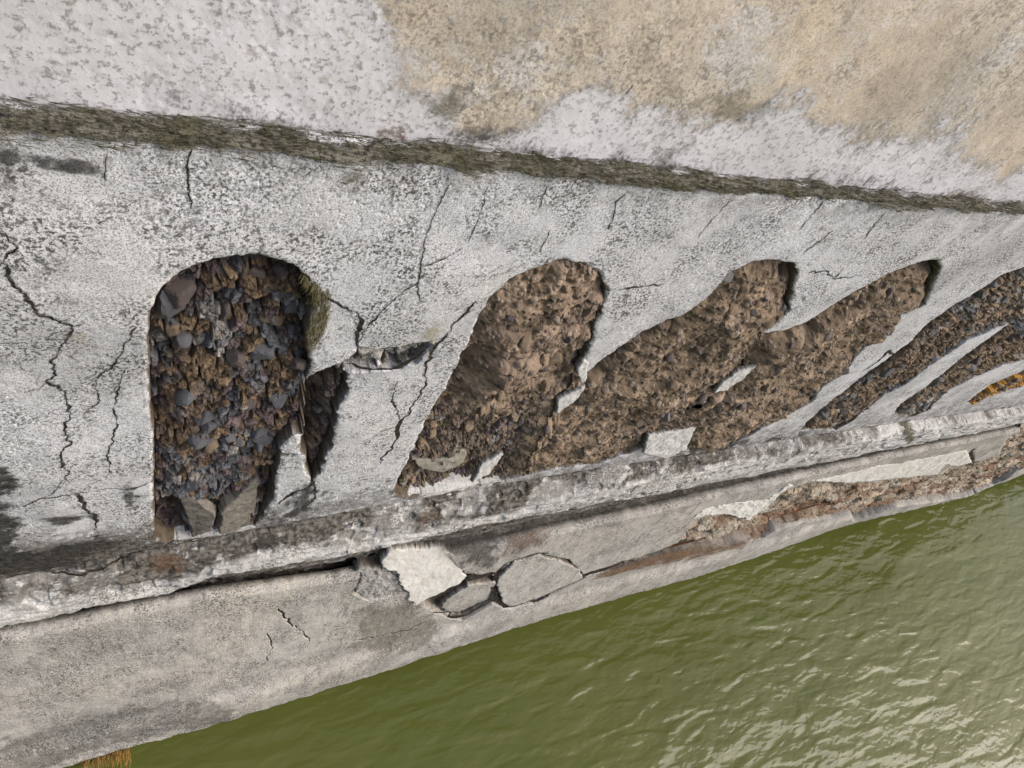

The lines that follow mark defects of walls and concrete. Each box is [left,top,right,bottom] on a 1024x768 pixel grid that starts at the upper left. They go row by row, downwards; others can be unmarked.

water stain [0,150,100,175]
crack [321,184,487,464]
crack [0,232,153,532]
spalling [661,424,1024,550]
crack [266,609,310,661]
crack [352,553,623,641]
rust [596,537,753,579]